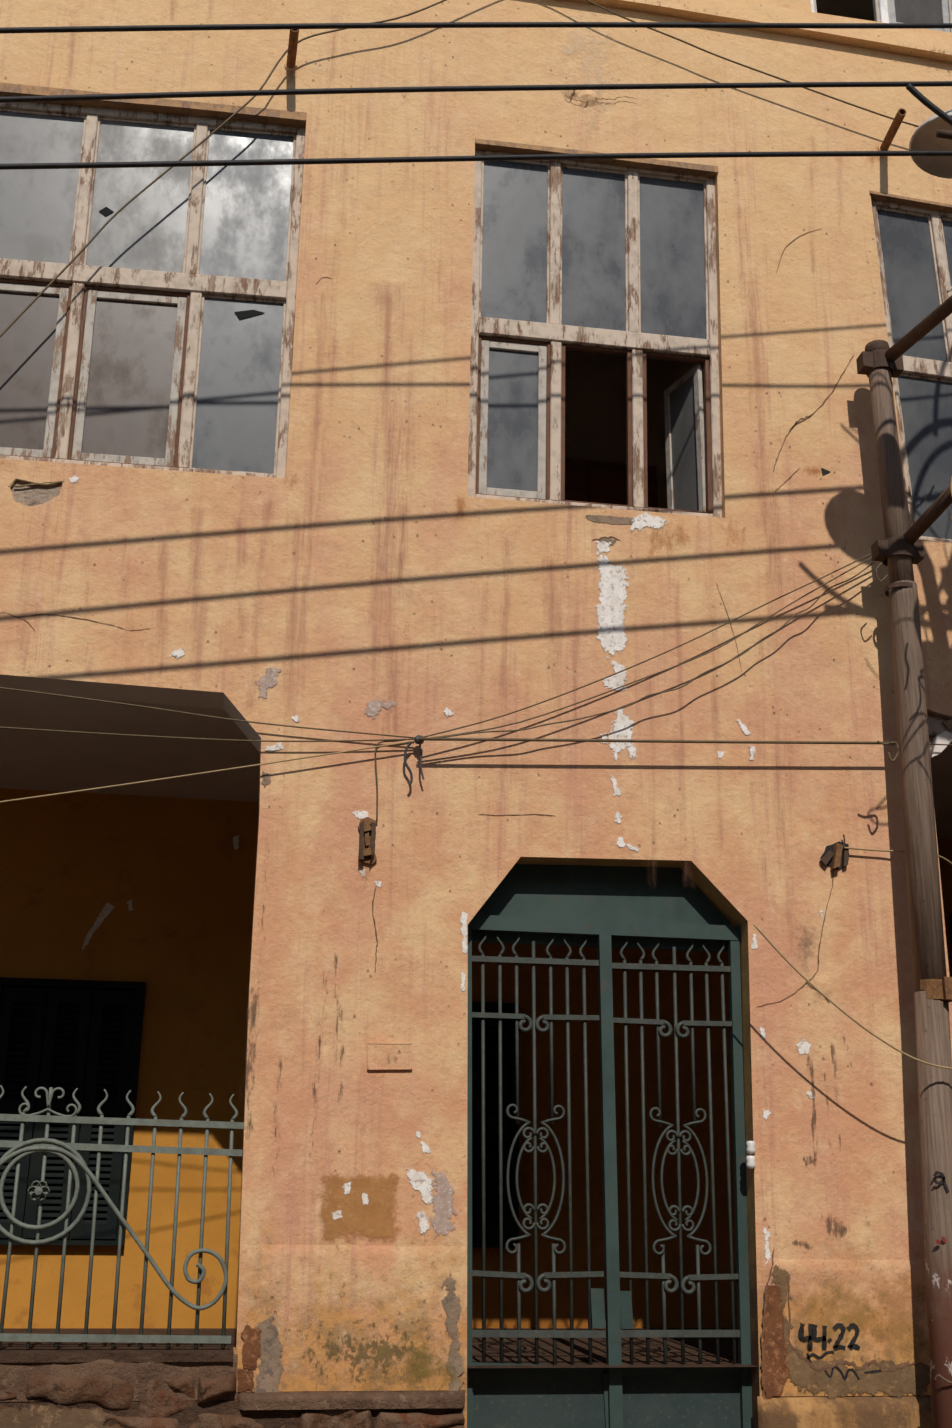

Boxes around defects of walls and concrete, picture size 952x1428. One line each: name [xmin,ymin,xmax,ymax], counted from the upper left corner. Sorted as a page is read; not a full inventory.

flaking render [8,476,79,506]
crack [0,612,150,631]
peeling [585,512,667,691]
flaking render [927,710,952,758]
peeling [600,708,639,852]
peeling [416,1131,431,1153]
peeling [406,1168,457,1239]
flaking render [761,1227,930,1400]
leakage [301,1319,431,1386]